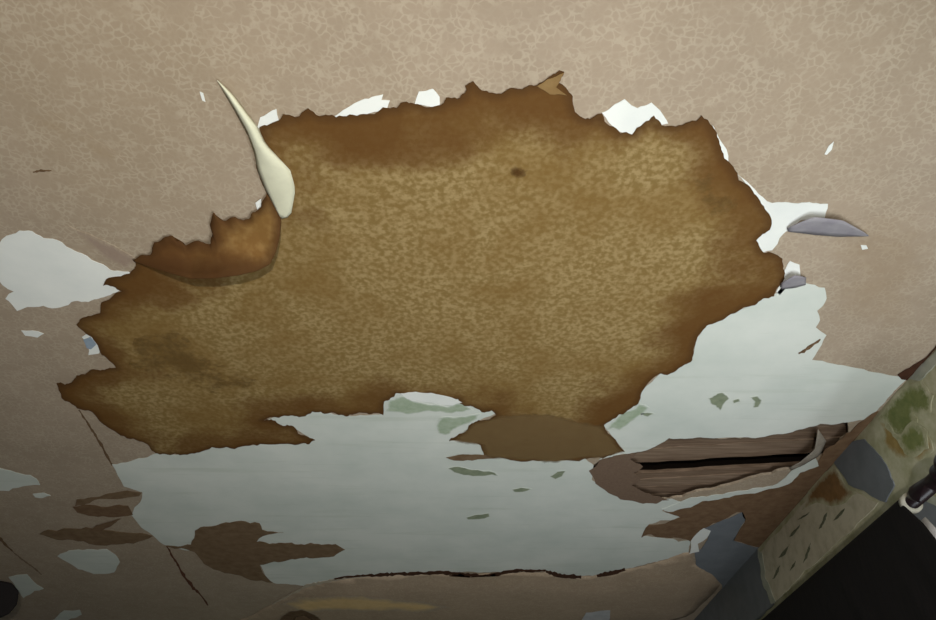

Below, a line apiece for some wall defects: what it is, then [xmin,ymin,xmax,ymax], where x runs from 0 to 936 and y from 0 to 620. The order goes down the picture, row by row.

peeling [257,109,279,128]
peeling [0,230,130,311]
leakage [57,70,785,462]
peeling [21,330,44,338]
peeling [82,334,100,355]
crack [78,410,112,466]
peeling [112,261,936,604]
peeling [0,468,51,498]
peeling [9,574,44,598]
peeling [58,549,120,574]
crack [166,546,208,606]